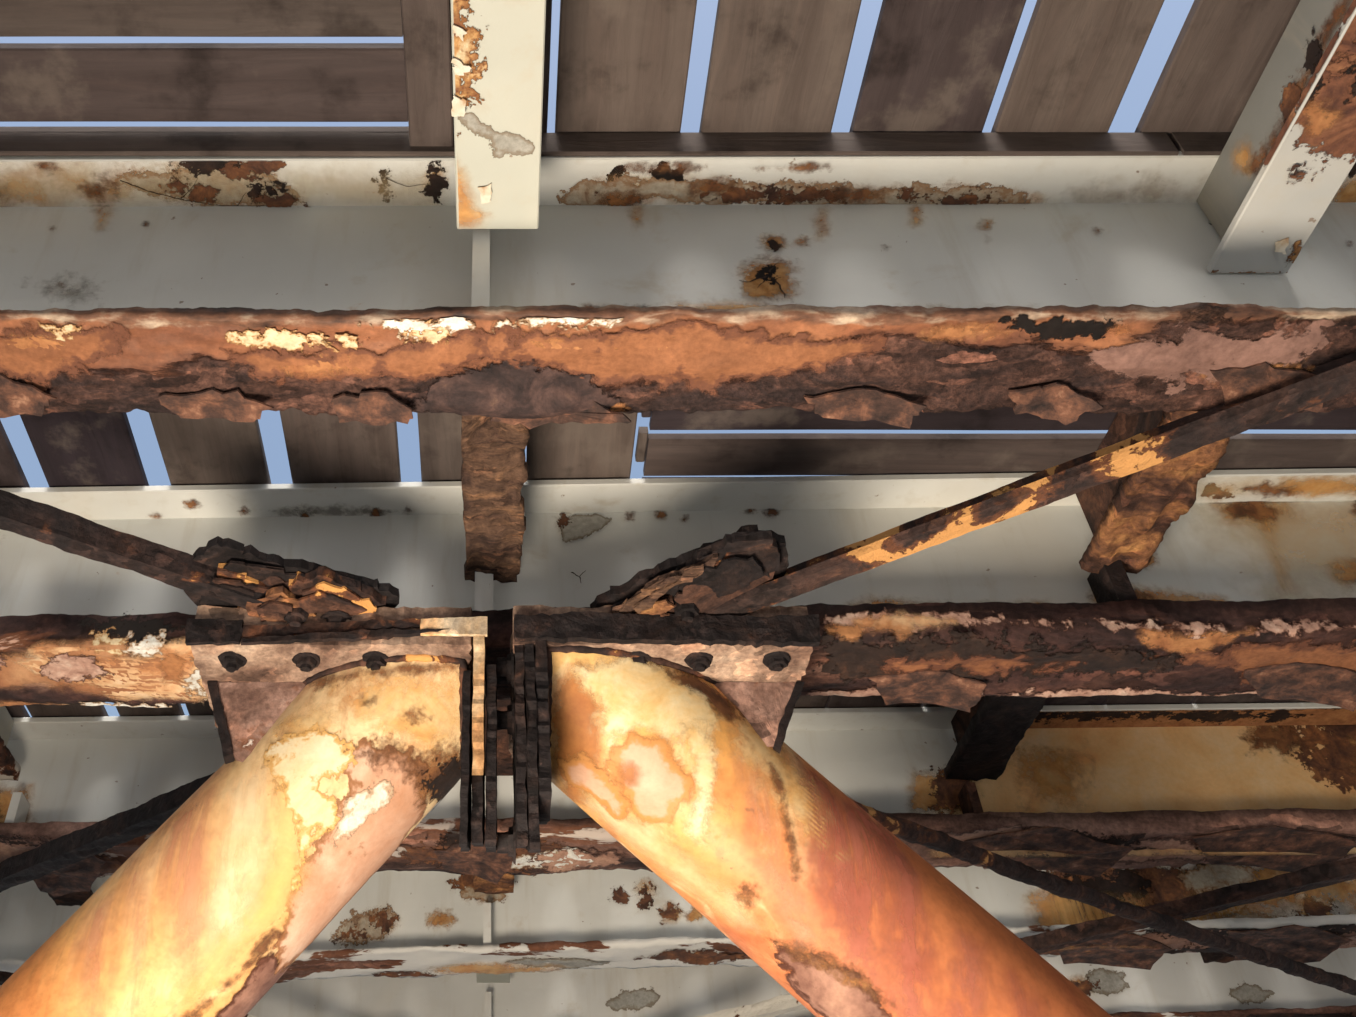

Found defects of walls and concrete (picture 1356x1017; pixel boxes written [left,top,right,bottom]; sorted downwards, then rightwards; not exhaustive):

peeling [451,0,535,159]
rust [1235,0,1356,203]
peeling [458,173,492,226]
rust [1201,479,1356,531]
rust [911,708,1356,815]
peeling [262,722,428,975]
rust [395,832,628,904]
rust [607,880,703,925]
rust [633,662,931,1017]
peeling [1190,893,1353,963]
peeling [605,986,660,1013]
peeling [1071,968,1130,996]